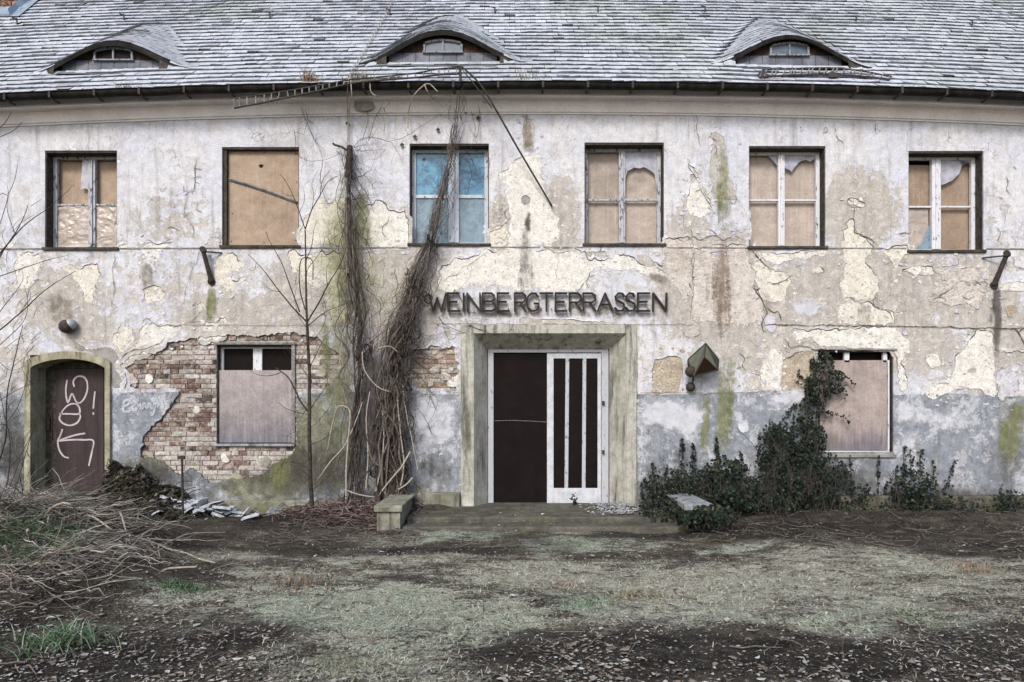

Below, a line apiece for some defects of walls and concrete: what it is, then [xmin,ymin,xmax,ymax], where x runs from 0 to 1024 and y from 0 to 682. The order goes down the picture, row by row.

flaking render [0,241,49,293]
flaking render [61,260,105,308]
flaking render [432,115,1024,411]
crack [439,116,1024,396]
spalling [73,191,418,490]
spalling [403,335,461,400]
damp [637,399,705,440]
damp [769,390,807,411]
damp [896,397,961,448]